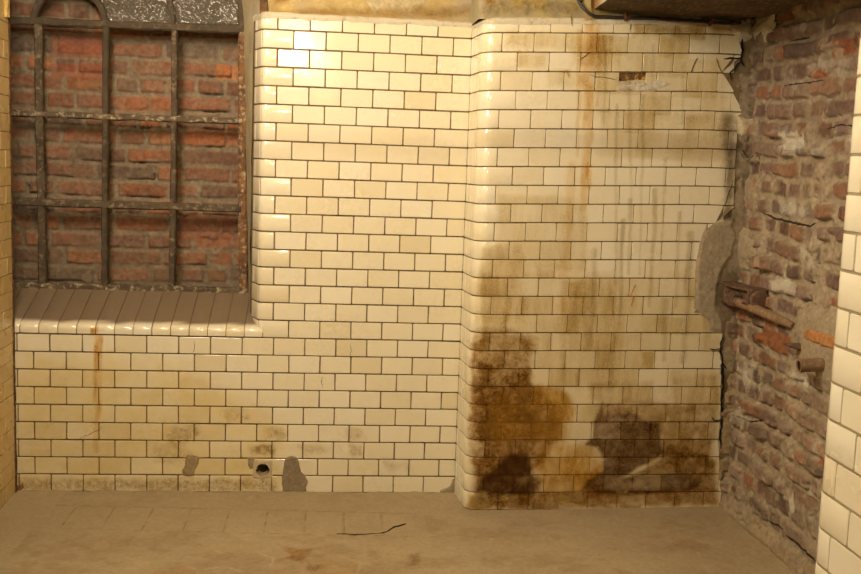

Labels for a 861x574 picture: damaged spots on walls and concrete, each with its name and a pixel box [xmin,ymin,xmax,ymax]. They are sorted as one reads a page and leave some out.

peeling [366,0,424,16]
crack [691,39,744,80]
spalling [616,73,671,92]
flaking render [804,329,835,349]
crack [337,523,406,535]